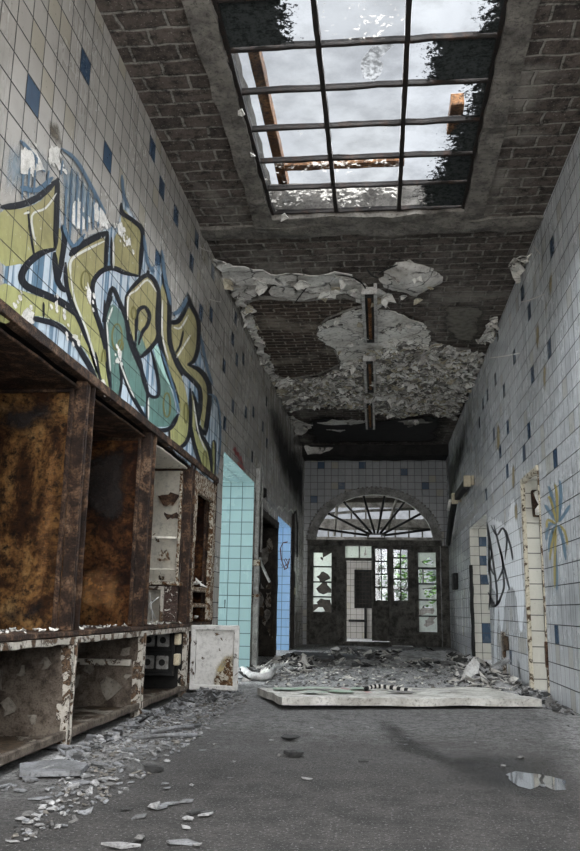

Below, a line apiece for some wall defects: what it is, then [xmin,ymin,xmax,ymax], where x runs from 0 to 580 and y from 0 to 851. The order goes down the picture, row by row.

peeling [213,259,500,435]
corrosion [88,450,124,520]
peeling [78,641,104,652]
peeling [0,670,17,717]
peeling [100,673,132,701]
corrosion [214,656,238,686]